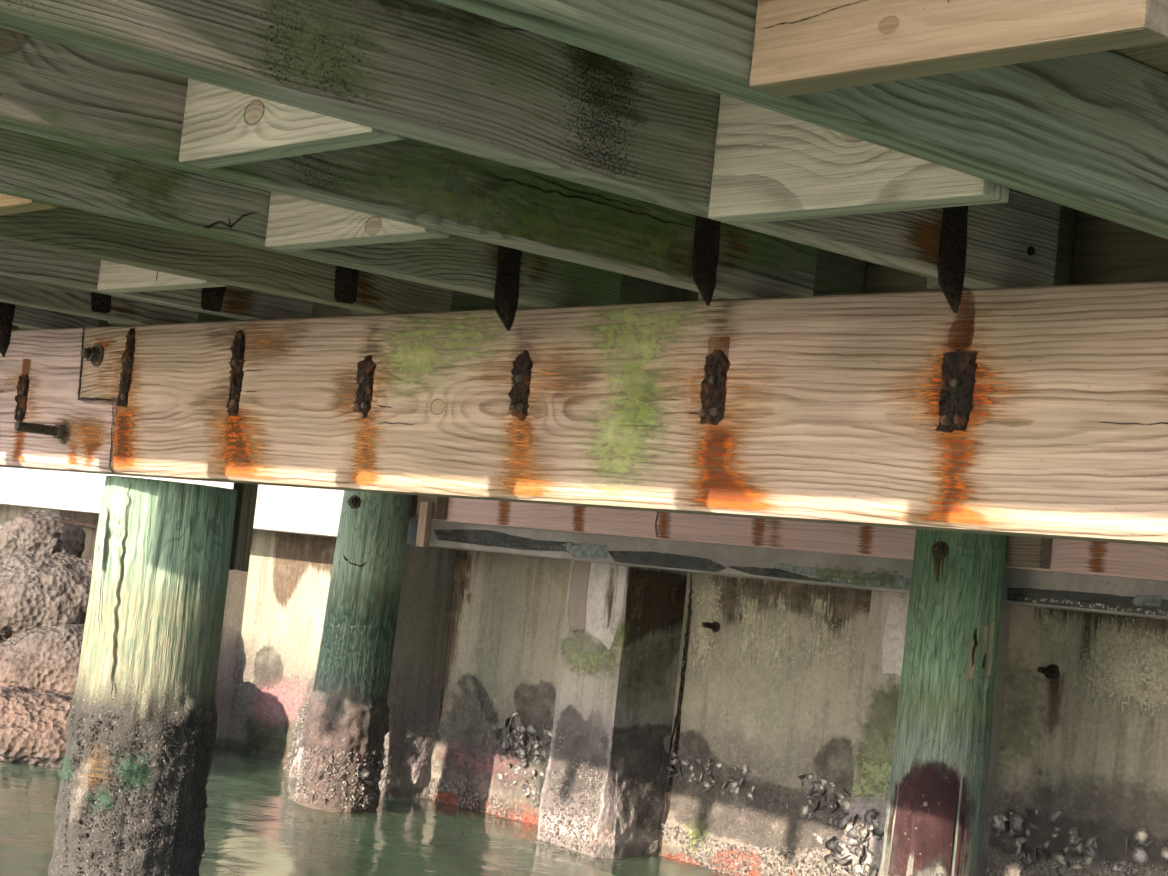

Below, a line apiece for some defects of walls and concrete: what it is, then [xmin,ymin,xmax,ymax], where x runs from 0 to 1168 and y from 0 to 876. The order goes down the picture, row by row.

crack [762,0,866,29]
water stain [553,39,650,179]
crack [192,211,259,228]
crack [435,157,733,237]
corrosion [9,359,38,461]
corrosion [67,341,139,468]
crack [79,329,132,694]
corrosion [498,414,551,525]
corrosion [658,302,779,547]
corrosion [896,291,1028,524]
peeling [962,617,995,682]
crack [660,573,692,854]